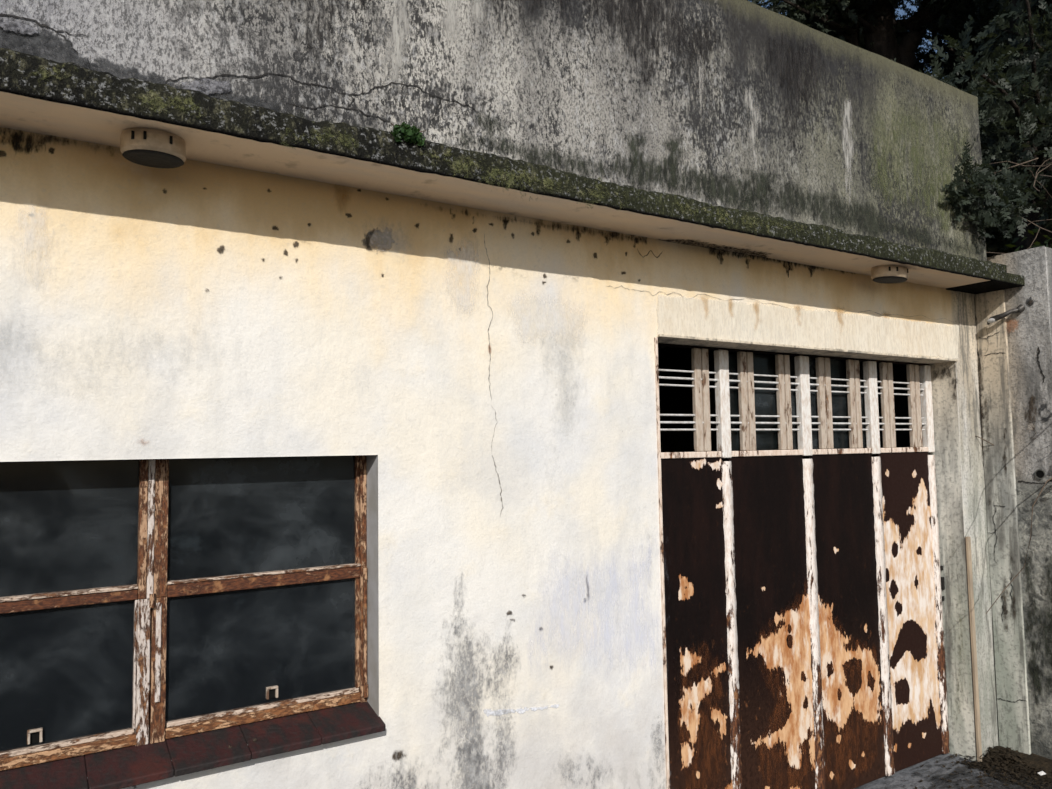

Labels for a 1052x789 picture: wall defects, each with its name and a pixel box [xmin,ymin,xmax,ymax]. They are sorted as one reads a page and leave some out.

crack [0,13,86,55]
water stain [301,0,341,57]
water stain [383,0,409,87]
water stain [587,0,721,104]
water stain [0,128,69,157]
water stain [478,116,501,139]
water stain [628,135,645,164]
water stain [664,138,682,182]
water stain [743,90,774,201]
water stain [843,102,853,202]
water stain [441,624,517,789]